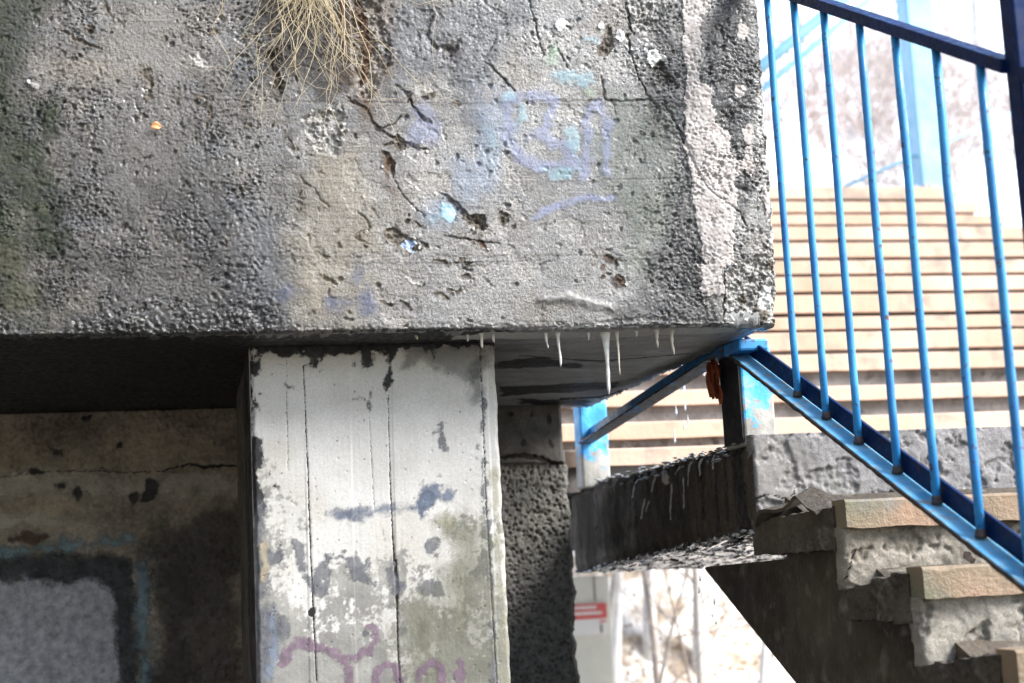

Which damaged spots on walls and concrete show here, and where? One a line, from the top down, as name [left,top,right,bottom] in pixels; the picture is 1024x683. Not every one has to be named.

crack [347,85,424,138]
spalling [380,134,429,179]
crack [483,0,691,182]
crack [313,213,549,266]
spalling [440,193,512,251]
damp [757,283,774,313]
damp [59,268,756,515]
crack [0,463,237,478]
peeling [469,445,495,588]
damp [583,447,754,573]
damp [143,508,240,683]
peeling [253,500,445,683]